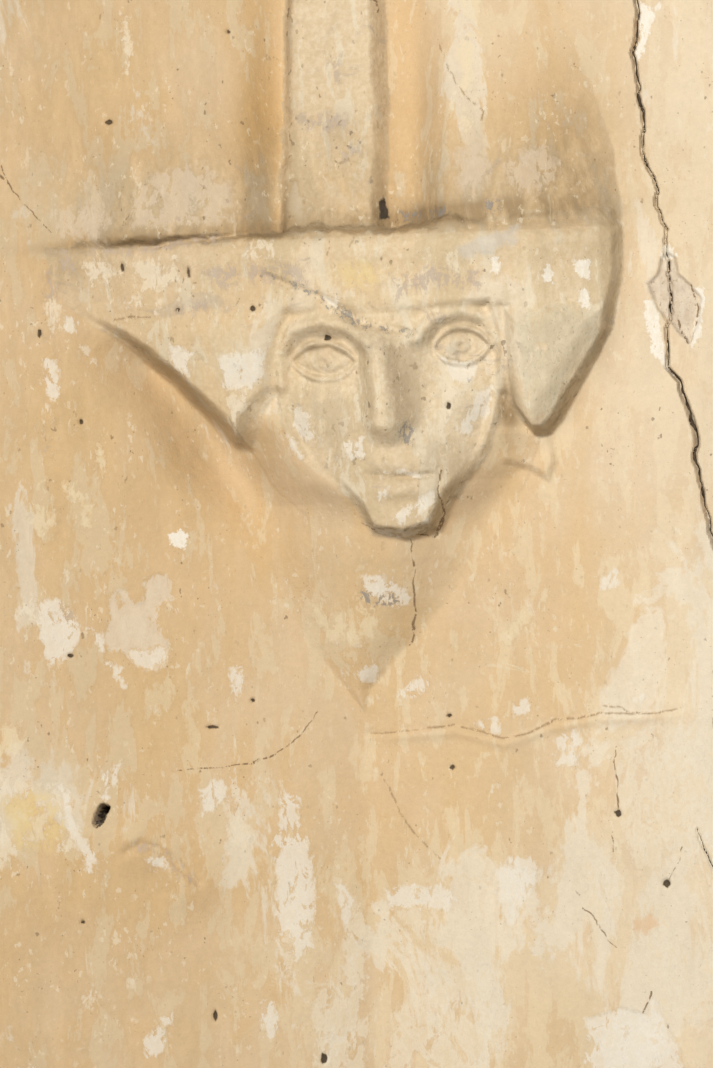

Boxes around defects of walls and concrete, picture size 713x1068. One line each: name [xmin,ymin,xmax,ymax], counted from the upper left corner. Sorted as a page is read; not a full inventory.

peeling [167,342,195,379]
peeling [217,344,270,446]
crack [632,0,713,537]
spalling [643,242,706,377]
crack [410,469,445,642]
peeling [7,562,177,691]
peeling [197,777,373,1068]
peeling [383,881,460,948]